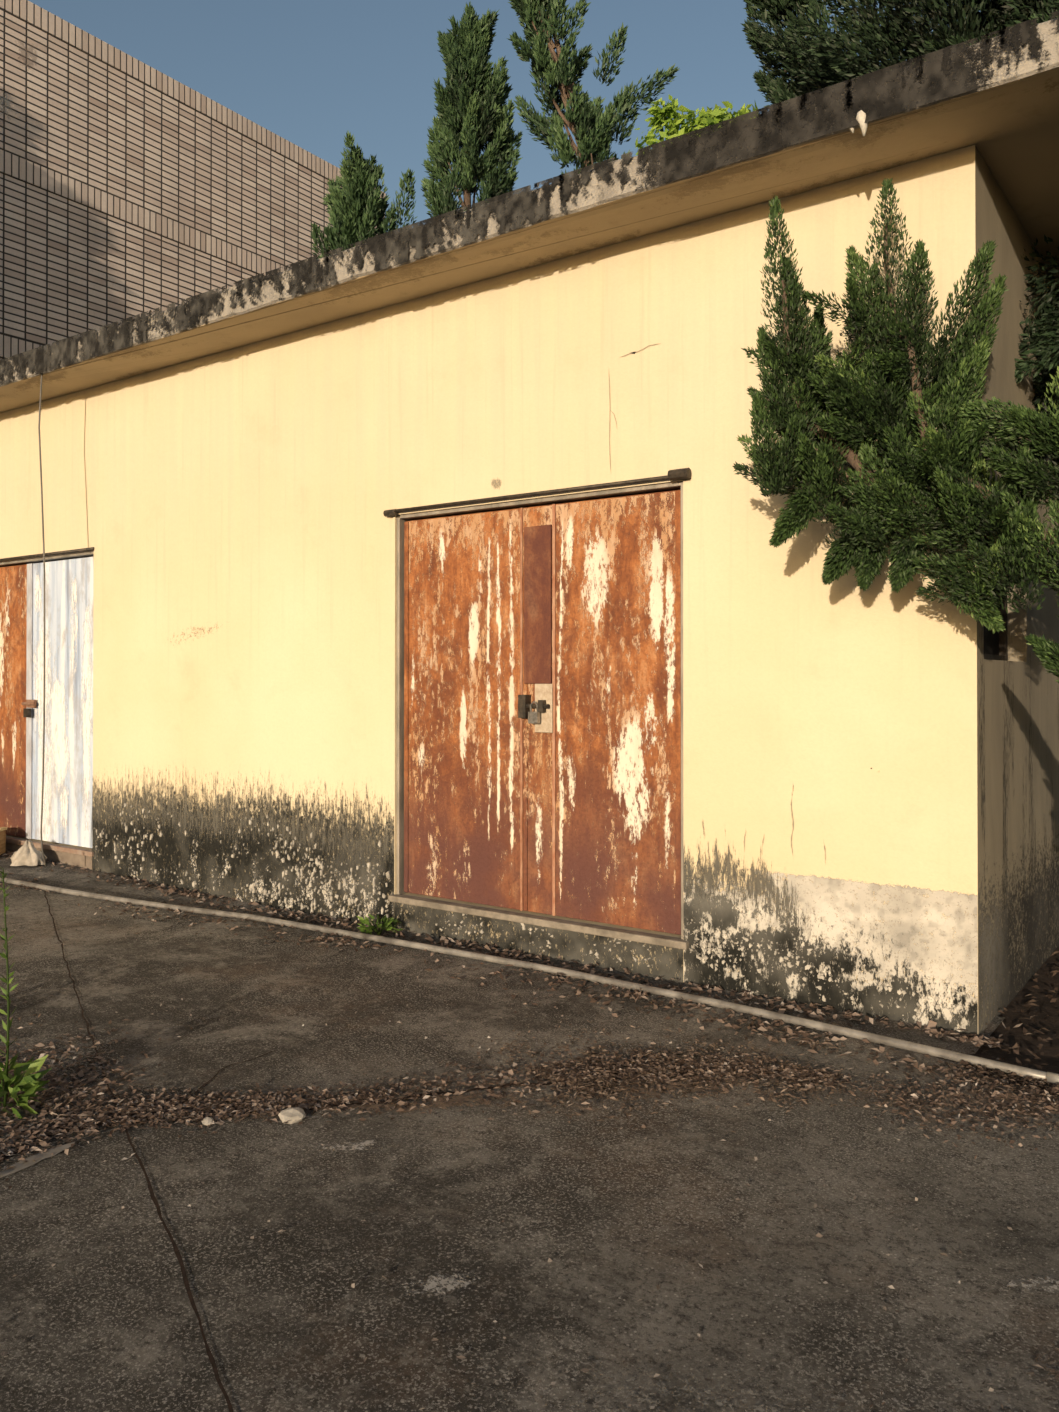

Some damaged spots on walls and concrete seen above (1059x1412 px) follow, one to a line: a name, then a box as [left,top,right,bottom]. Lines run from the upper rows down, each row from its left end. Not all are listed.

water stain [0,10,1059,385]
water stain [92,628,1059,1036]
crack [0,882,708,1412]